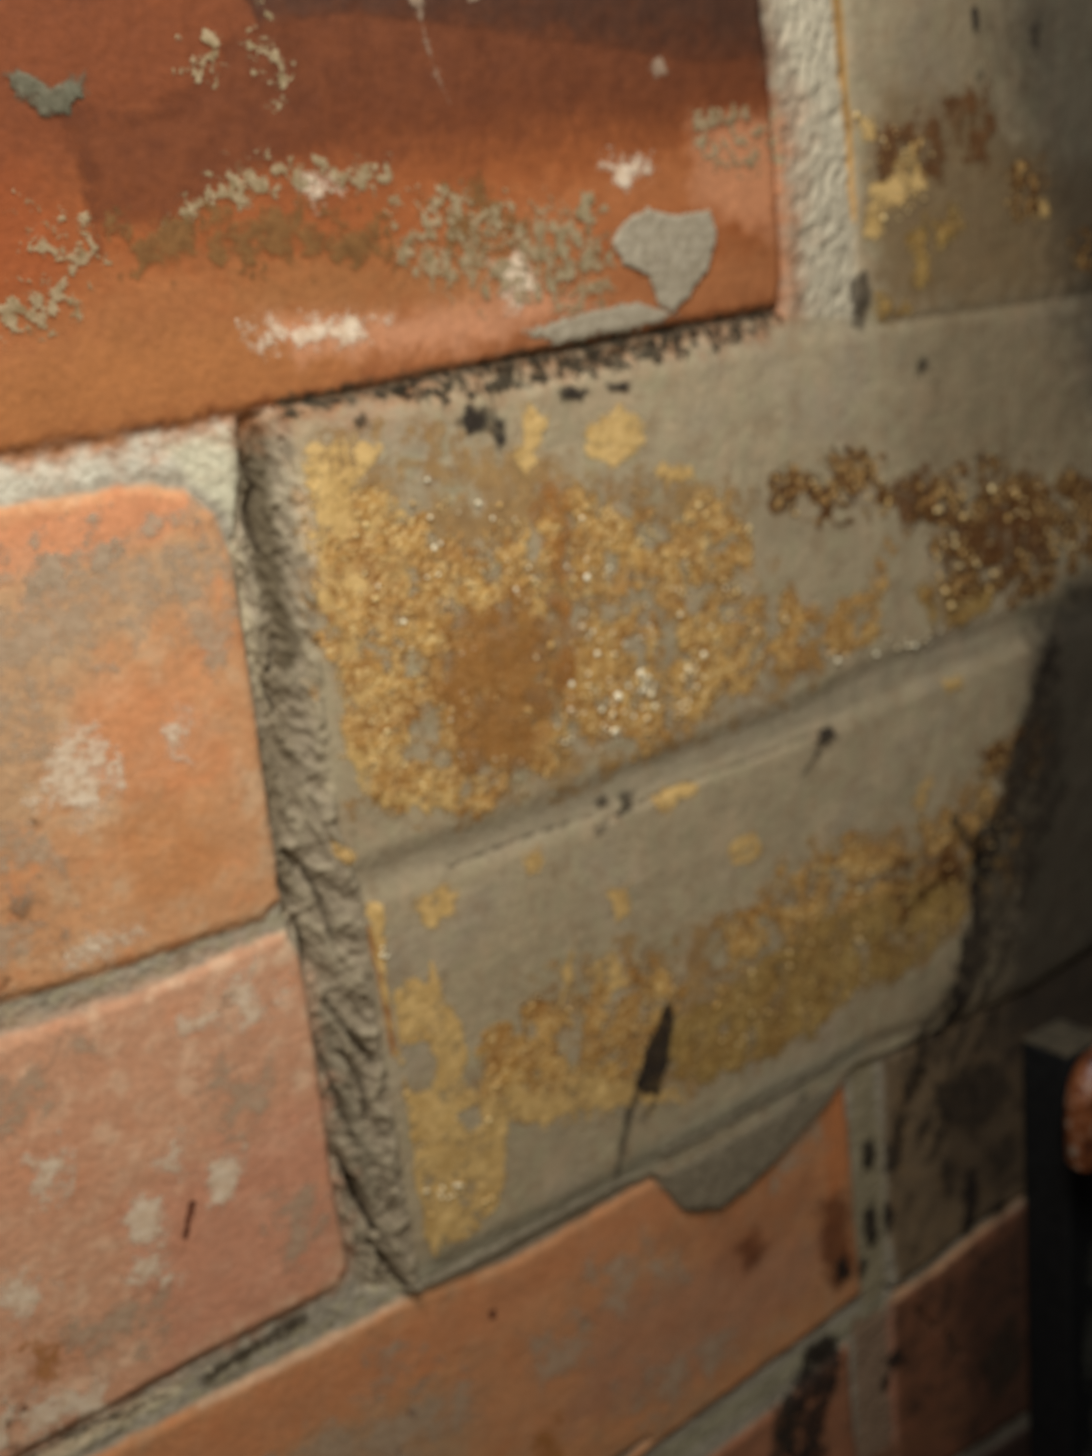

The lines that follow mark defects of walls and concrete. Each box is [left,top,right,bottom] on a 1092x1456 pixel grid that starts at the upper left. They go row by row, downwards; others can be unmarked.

peeling [172,28,226,89]
peeling [240,1,295,113]
water stain [259,316,366,348]
peeling [0,148,677,346]
water stain [496,252,540,308]
peeling [296,403,1092,830]
peeling [411,884,459,928]
peeling [365,902,693,1257]